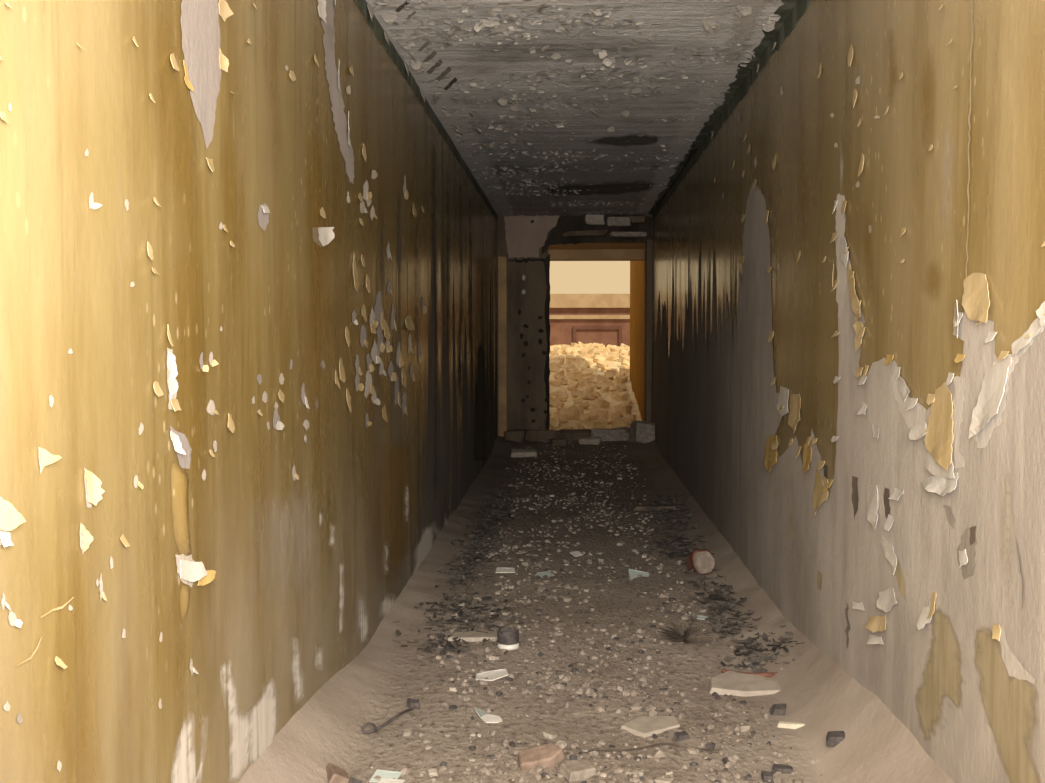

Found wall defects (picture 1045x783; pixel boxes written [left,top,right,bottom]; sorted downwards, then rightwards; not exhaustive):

peeling [170,0,235,172]
peeling [314,0,378,226]
peeling [367,0,780,217]
peeling [0,497,26,547]
peeling [79,523,93,553]
peeling [84,468,105,508]
peeling [170,426,216,623]
peeling [199,352,219,372]
peeling [207,399,235,433]
peeling [252,359,293,430]
peeling [320,252,427,428]
peeling [651,134,1045,783]